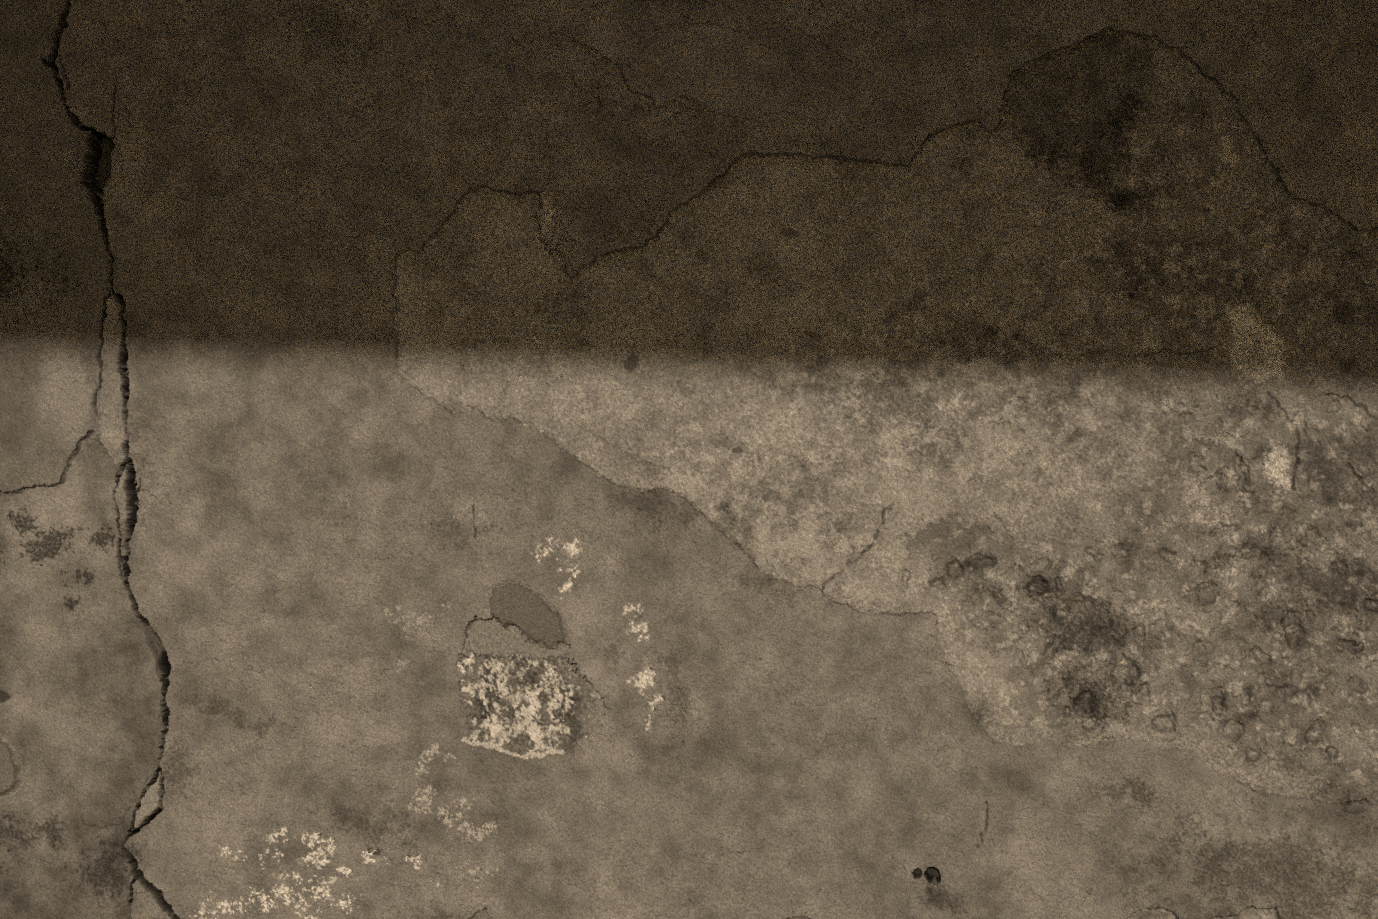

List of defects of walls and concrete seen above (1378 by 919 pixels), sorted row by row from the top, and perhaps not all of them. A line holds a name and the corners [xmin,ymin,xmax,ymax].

crack [42,56,71,91]
crack [75,90,117,203]
flaking render [390,26,1378,815]
crack [94,289,180,919]
flaking render [1211,905,1282,919]